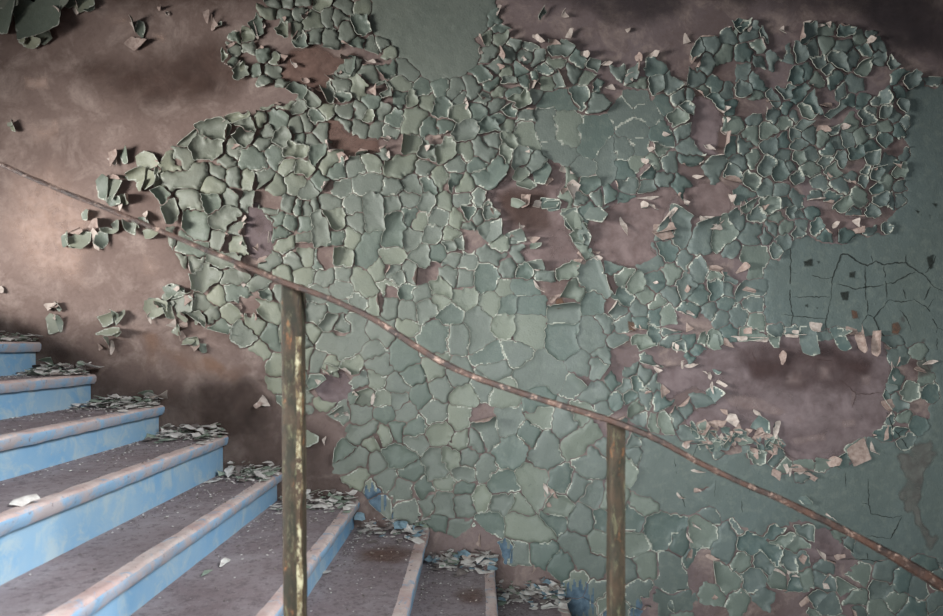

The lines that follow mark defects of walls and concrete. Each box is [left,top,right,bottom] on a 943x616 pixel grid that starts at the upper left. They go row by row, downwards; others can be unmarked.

peeling [61,209,158,251]
peeling [96,309,125,355]
peeling [95,174,129,211]
peeling [107,145,128,167]
peeling [124,0,943,549]
crack [784,218,942,346]
peeling [305,293,607,616]
peeling [625,430,943,616]